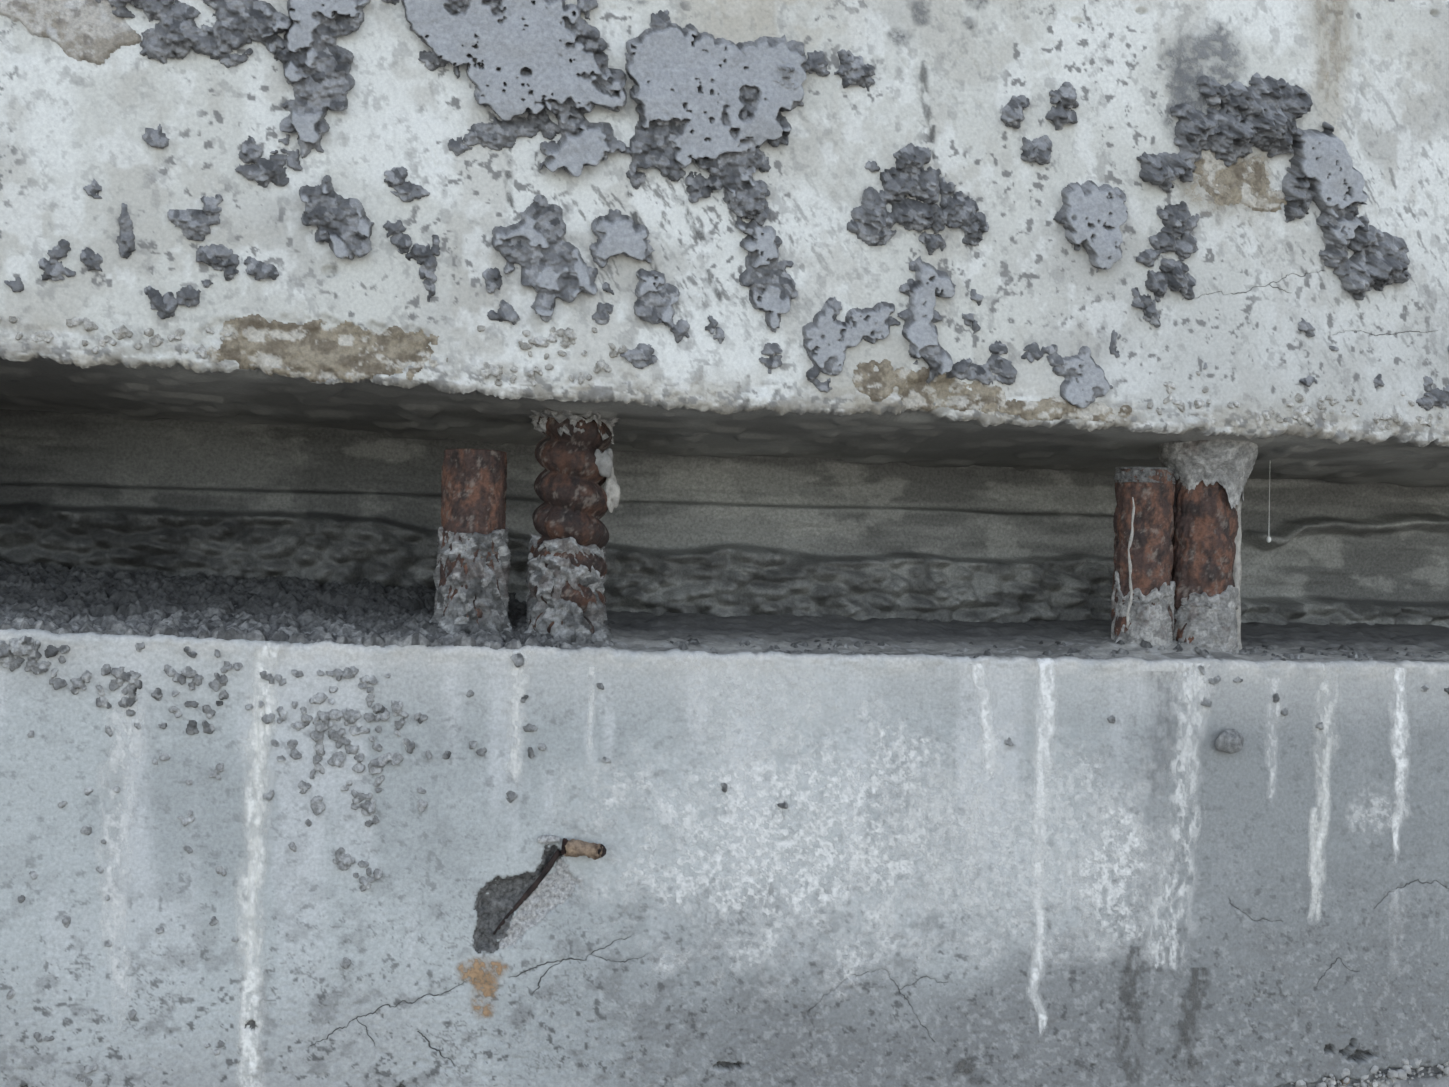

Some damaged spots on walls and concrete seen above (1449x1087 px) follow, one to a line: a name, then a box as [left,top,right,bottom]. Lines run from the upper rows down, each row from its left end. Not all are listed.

peeling [382,0,627,177]
spalling [207,314,439,384]
peeling [482,195,725,344]
peeling [802,143,1132,423]
crack [1182,270,1325,300]
peeling [1131,72,1411,328]
leakage [595,658,1207,1079]
leakage [1267,678,1279,793]
efflorescence [1309,662,1337,919]
efflorescence [1354,668,1408,851]
corrosion [458,959,507,1016]
crack [510,936,649,994]